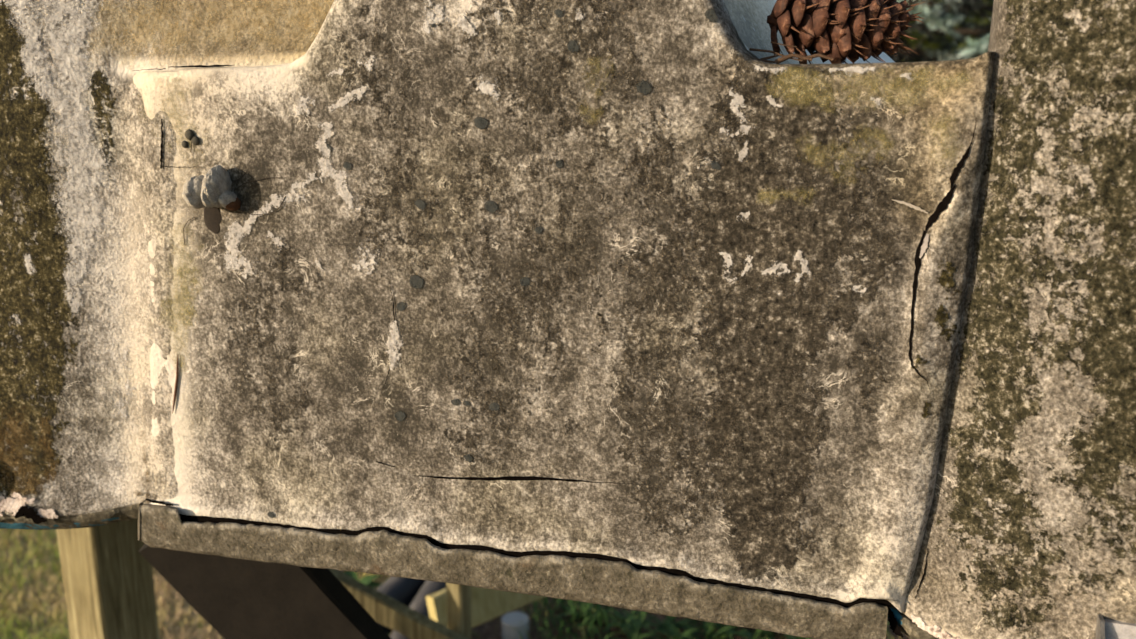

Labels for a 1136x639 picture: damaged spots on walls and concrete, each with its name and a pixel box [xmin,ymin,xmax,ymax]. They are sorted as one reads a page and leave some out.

damp [4,106,81,332]
crack [893,117,977,393]
damp [934,0,1136,639]
damp [0,371,26,499]
spalling [0,492,142,530]
crack [376,461,644,485]
crack [139,498,928,638]